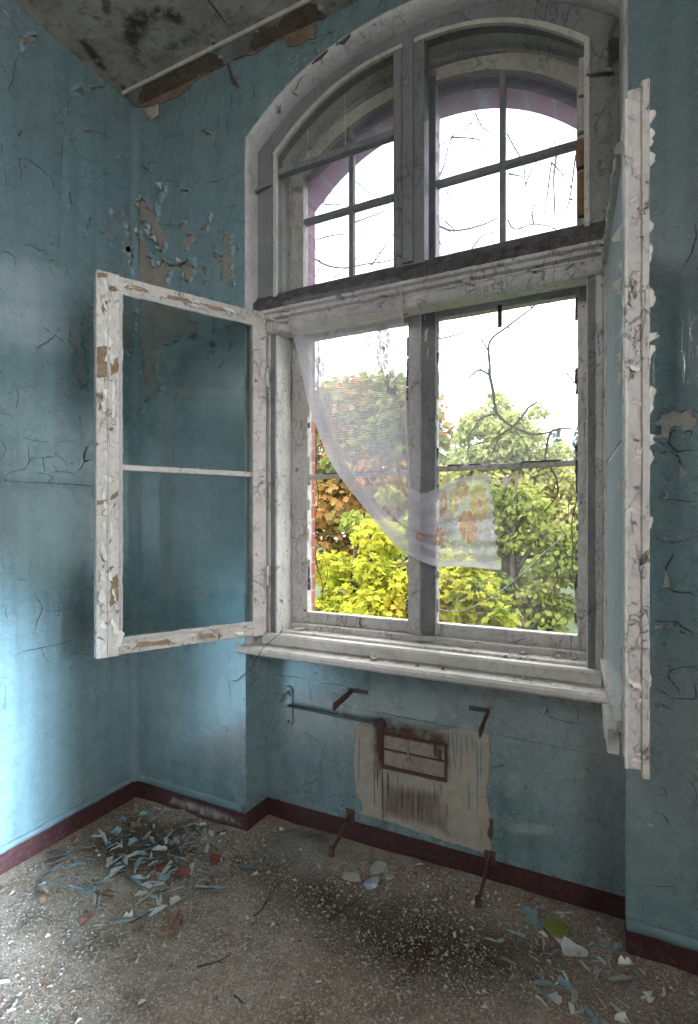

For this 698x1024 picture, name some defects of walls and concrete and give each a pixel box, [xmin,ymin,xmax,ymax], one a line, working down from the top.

spalling [136,3,326,121]
crack [0,98,111,277]
peeling [107,145,242,289]
peeling [101,278,238,429]
crack [1,371,92,486]
peeling [633,386,698,502]
crack [655,643,697,700]
corrosion [374,720,447,819]